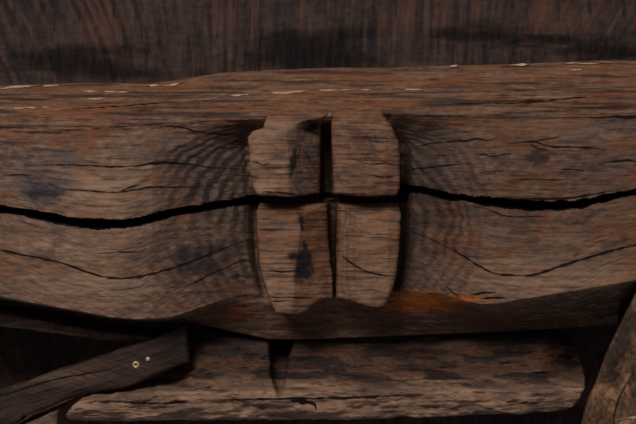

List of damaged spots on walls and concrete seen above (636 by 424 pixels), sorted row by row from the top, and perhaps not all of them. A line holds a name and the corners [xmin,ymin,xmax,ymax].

crack [65,102,181,110]
crack [493,96,595,104]
crack [154,125,246,137]
crack [405,136,633,169]
crack [11,161,269,176]
crack [51,184,210,193]
crack [361,162,636,217]
crack [0,191,295,229]
crack [1,229,282,279]
crack [402,226,636,276]
crack [342,255,393,276]
crack [448,288,505,302]